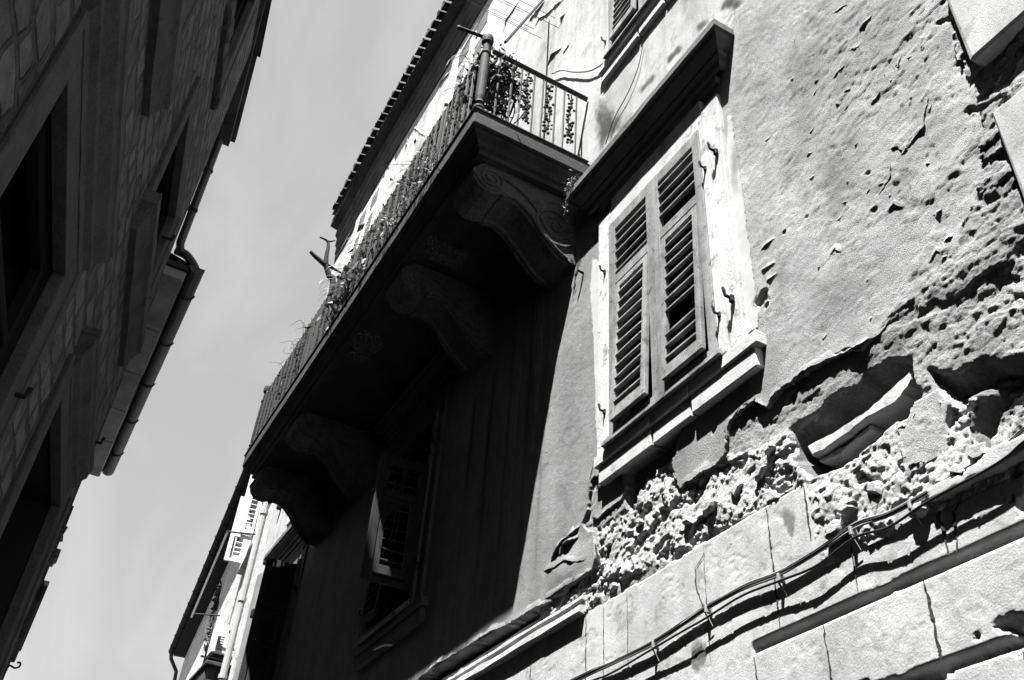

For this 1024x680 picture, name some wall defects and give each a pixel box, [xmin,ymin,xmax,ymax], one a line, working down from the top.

flaking render [529,0,565,24]
spalling [423,24,1024,676]